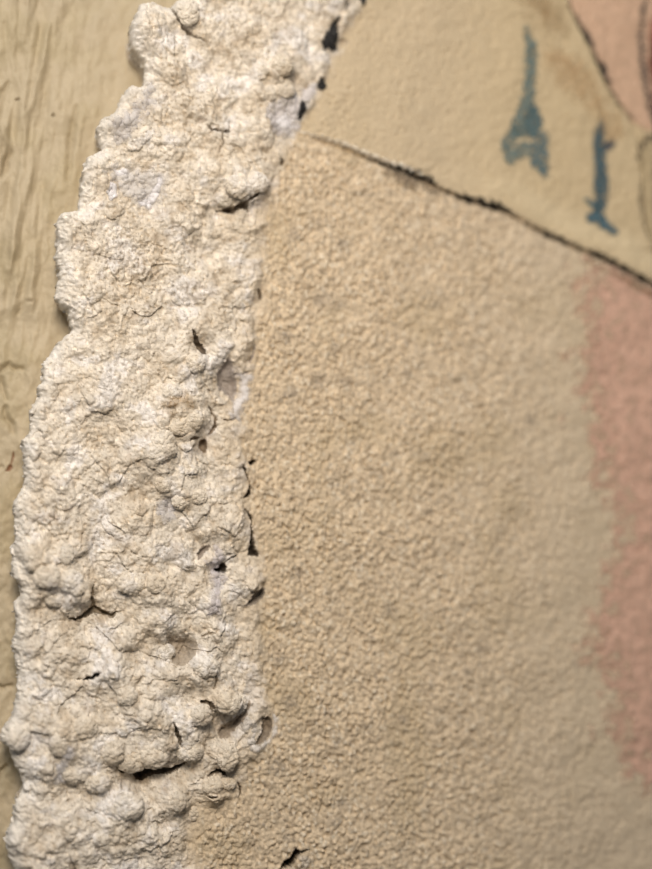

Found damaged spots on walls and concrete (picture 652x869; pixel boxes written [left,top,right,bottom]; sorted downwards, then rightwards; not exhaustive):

crack [170,8,204,41]
crack [208,126,230,152]
crack [243,460,259,557]
crack [77,672,100,680]
crack [280,848,309,869]